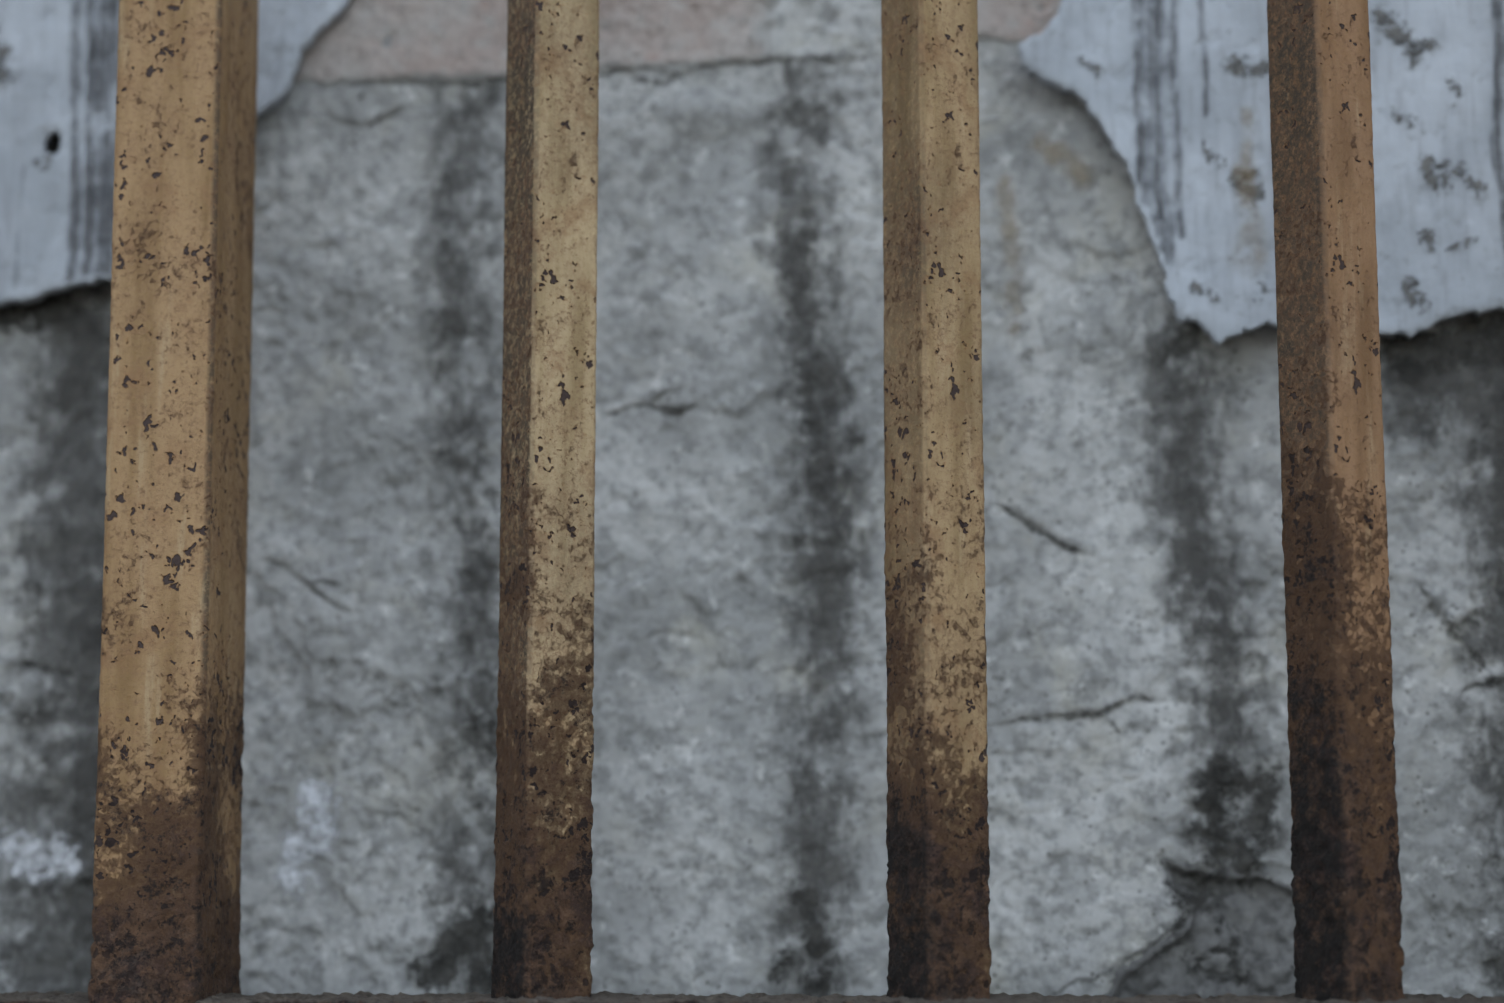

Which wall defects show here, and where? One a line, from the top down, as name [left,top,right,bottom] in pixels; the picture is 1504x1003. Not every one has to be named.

flaking render [0,0,119,307]
leakage [71,0,117,108]
leakage [433,79,501,374]
flaking render [977,0,1277,346]
flaking render [1368,0,1504,339]
leakage [0,118,115,994]
leakage [407,381,499,994]
leakage [764,59,867,997]
leakage [1143,322,1284,987]